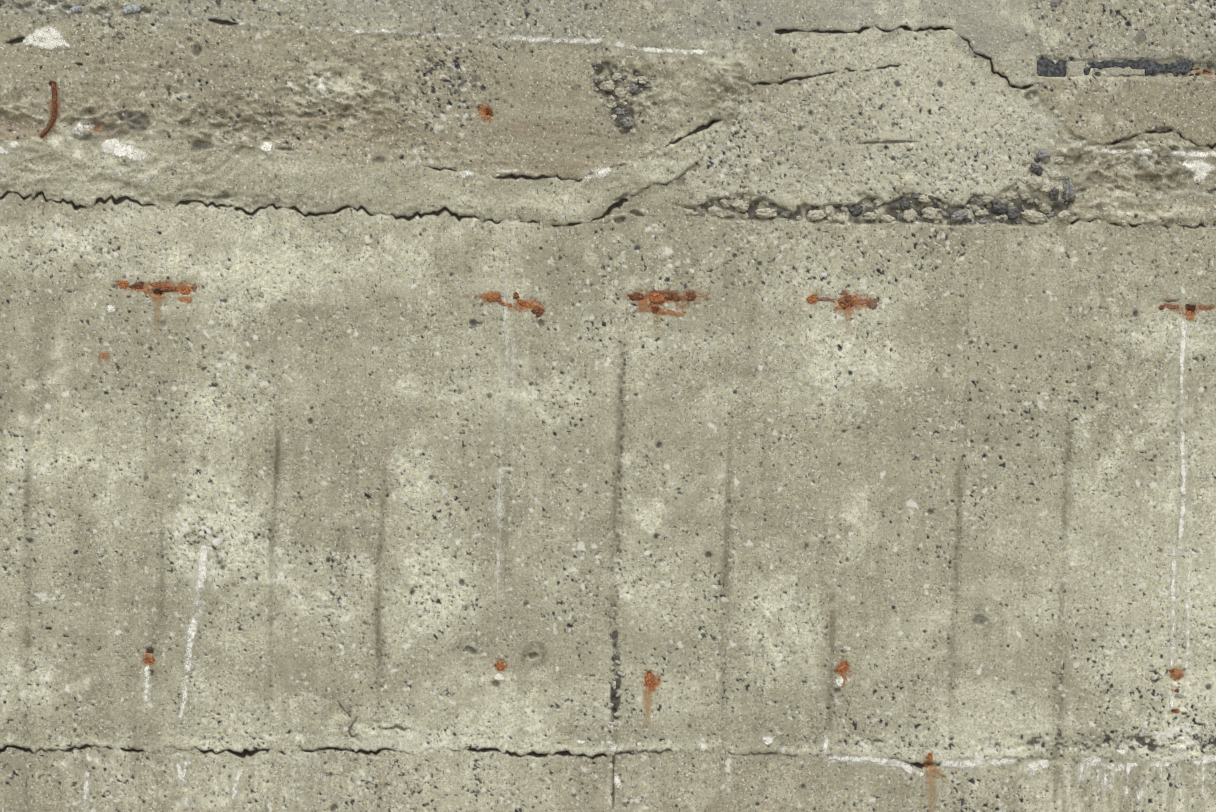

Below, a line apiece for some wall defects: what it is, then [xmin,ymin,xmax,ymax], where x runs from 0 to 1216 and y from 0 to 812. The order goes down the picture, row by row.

crack [753,26,1033,89]
crack [666,120,720,146]
spalling [683,19,1216,226]
crack [496,165,622,182]
crack [0,173,686,227]
corrosion [131,281,194,310]
corrosion [480,291,544,312]
corrosion [630,290,707,317]
corrosion [643,670,661,712]
crack [0,744,144,754]
crack [196,703,409,758]
crack [466,748,672,801]